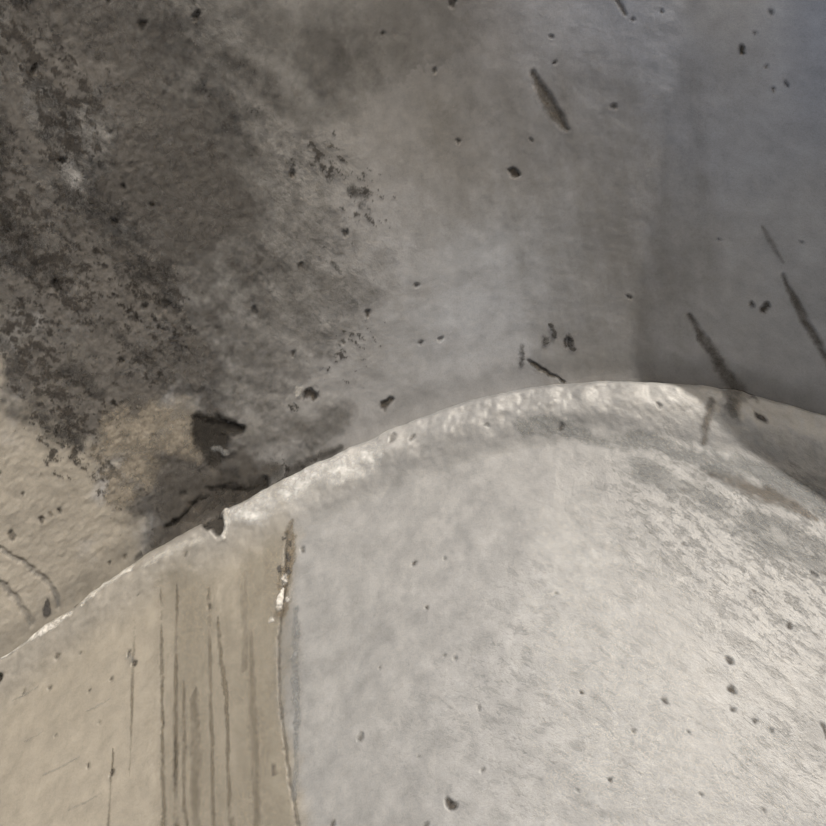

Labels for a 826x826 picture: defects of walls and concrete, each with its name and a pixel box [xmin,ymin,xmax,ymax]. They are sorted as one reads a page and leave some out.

damp [531,72,568,130]
damp [308,131,347,182]
damp [0,0,264,497]
damp [783,275,826,359]
damp [115,433,270,532]
spalling [193,415,244,475]
damp [278,450,382,499]
damp [617,431,826,520]
damp [266,561,289,608]
damp [1,614,70,659]
damp [209,642,231,807]
crack [272,607,300,821]